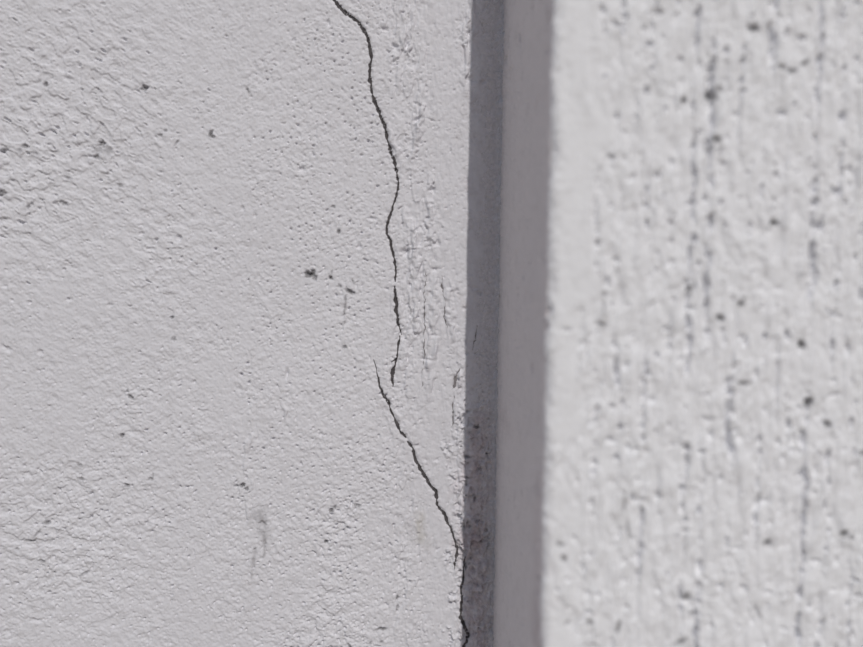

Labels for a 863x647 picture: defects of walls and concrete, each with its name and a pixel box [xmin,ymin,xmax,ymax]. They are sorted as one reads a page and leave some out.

crack [333,0,470,647]